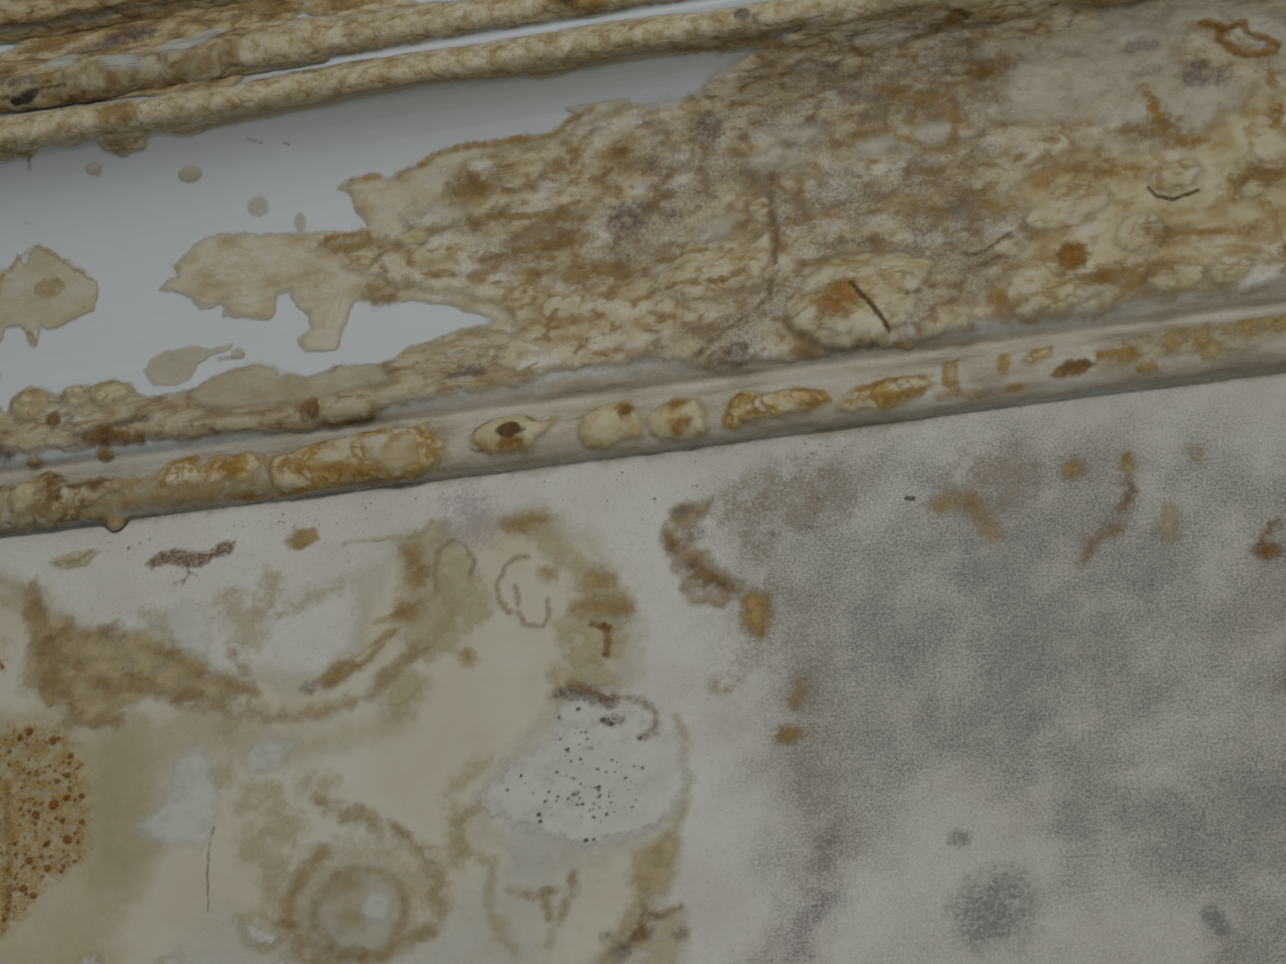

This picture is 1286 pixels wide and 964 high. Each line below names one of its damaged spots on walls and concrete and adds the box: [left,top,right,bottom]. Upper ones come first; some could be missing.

peeling [0,0,1286,535]
water stain [662,466,847,637]
rust [0,727,85,921]
water stain [0,497,680,964]
water stain [965,876,1026,940]